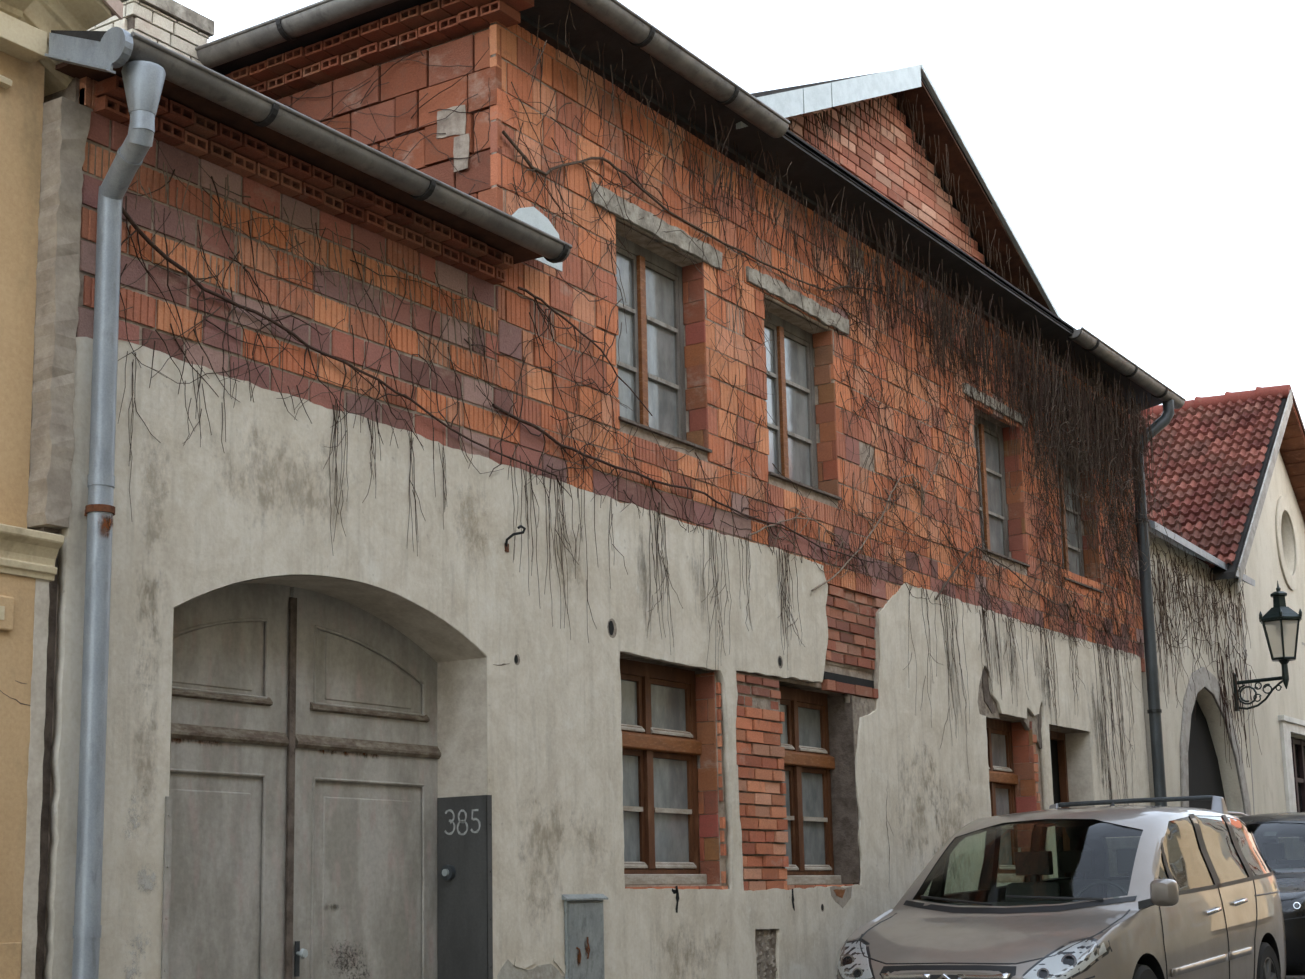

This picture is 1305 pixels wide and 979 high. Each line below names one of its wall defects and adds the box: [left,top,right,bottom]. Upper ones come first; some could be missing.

rust [100,516,113,537]
flaking render [821,580,889,755]
flaking render [978,668,1000,719]
flaking render [1020,705,1042,749]
flaking render [736,656,789,891]
flaking render [821,845,860,912]